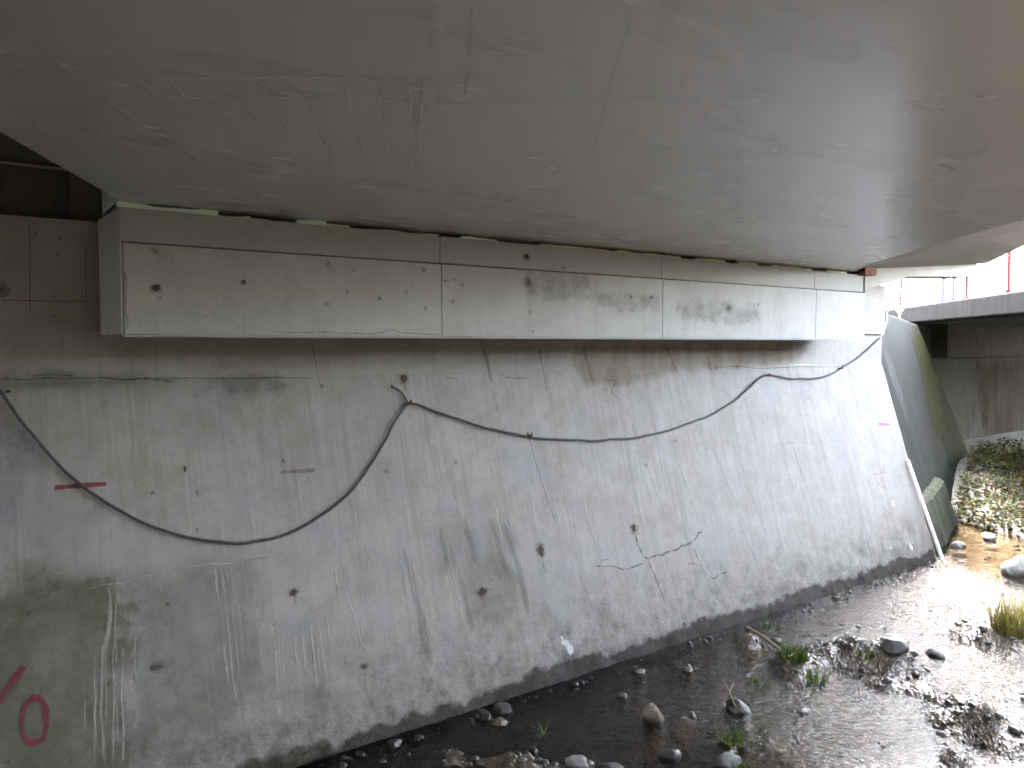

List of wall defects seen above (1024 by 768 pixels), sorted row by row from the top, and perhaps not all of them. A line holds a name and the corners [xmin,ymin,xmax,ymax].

water stain [282,549,938,768]
crack [596,529,733,580]